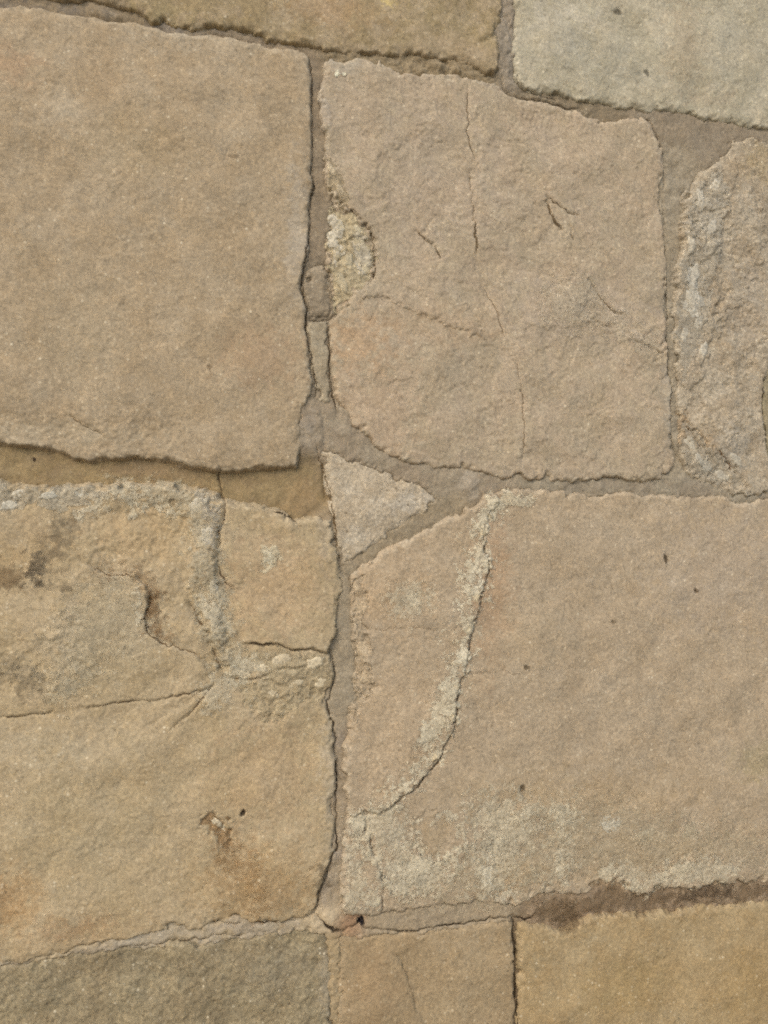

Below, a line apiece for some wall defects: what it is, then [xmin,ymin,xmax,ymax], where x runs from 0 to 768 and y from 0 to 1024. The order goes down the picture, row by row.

spalling [323,157,380,314]
crack [469,181,478,250]
crack [98,689,209,725]
crack [250,642,532,1024]
damp [598,862,640,892]